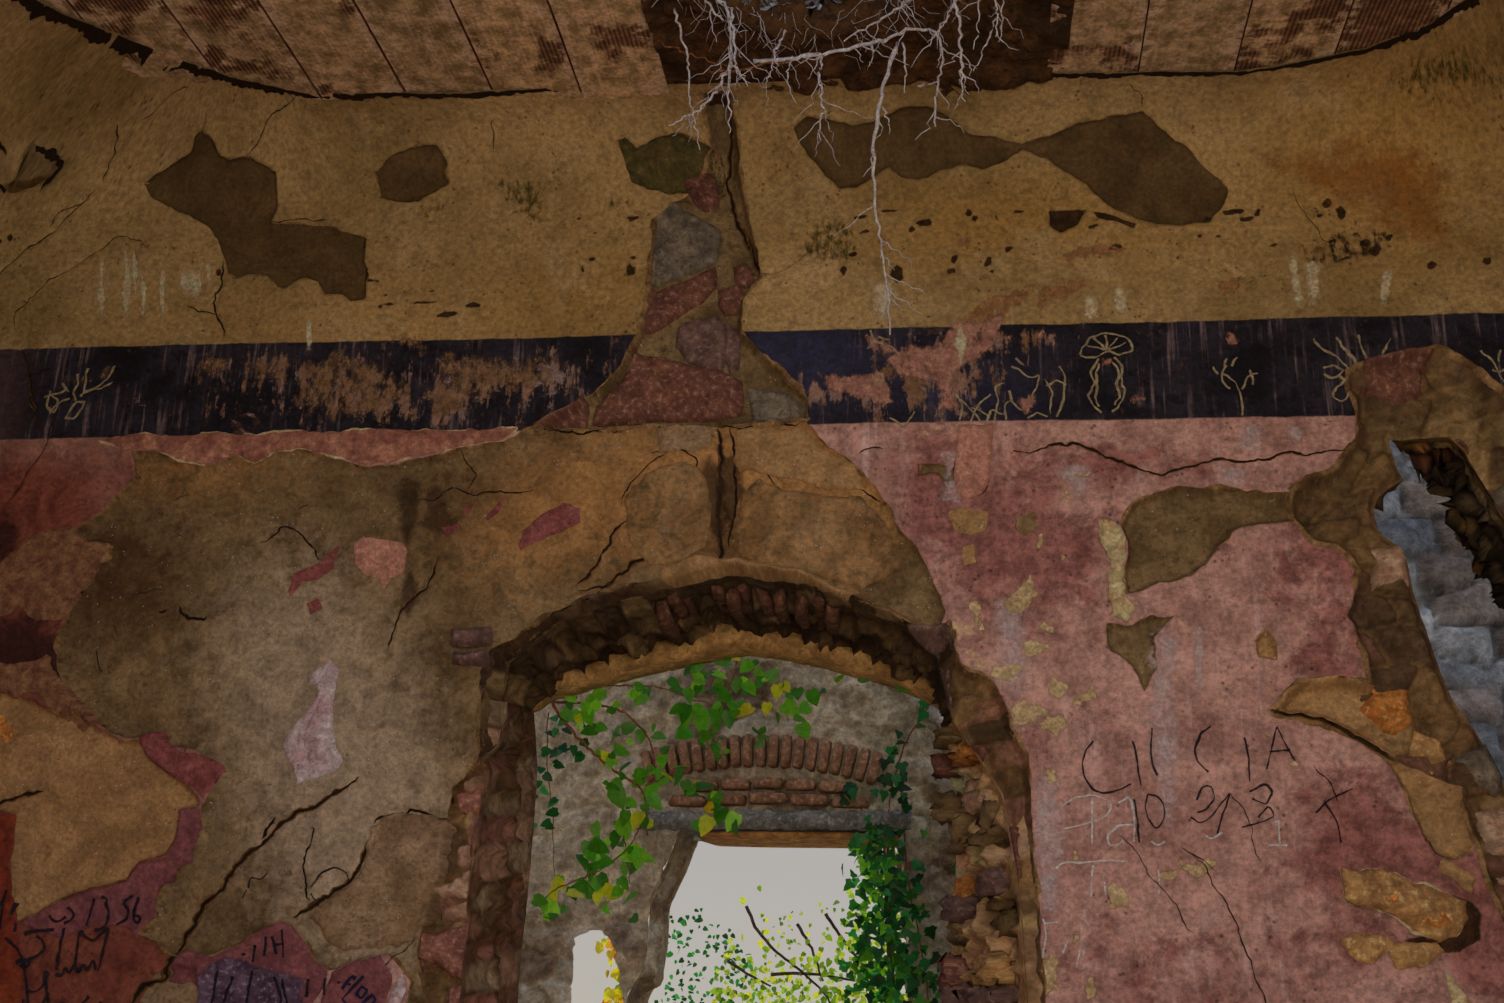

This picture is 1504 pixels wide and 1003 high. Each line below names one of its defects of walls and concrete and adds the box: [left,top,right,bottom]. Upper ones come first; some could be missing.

flaking render [794,107,1228,232]
crack [388,560,438,651]
flaking render [0,90,1097,1003]
crack [523,420,806,620]
flaking render [1098,484,1293,691]
crack [1012,344,1504,933]
crack [131,777,451,1003]
crack [1181,847,1266,1003]
flaking render [1339,765,1482,1003]